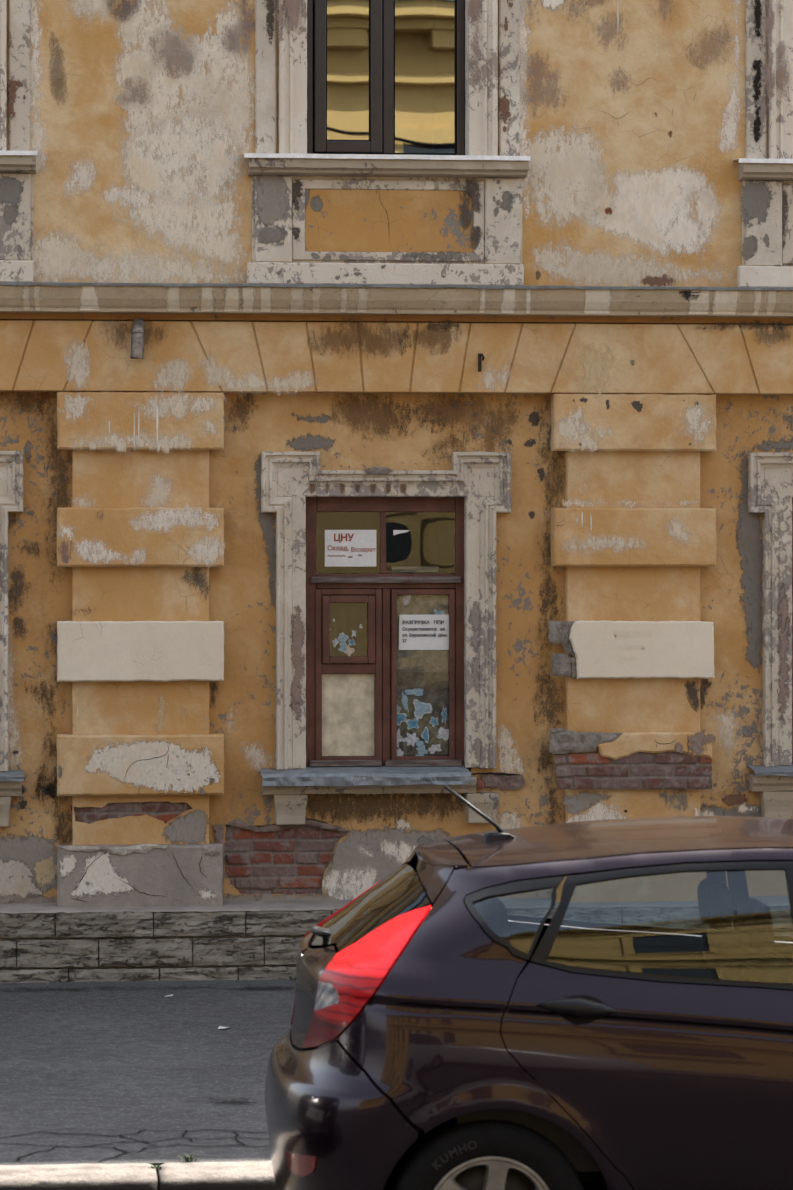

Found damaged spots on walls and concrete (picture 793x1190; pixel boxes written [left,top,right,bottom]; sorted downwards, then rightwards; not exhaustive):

peeling [7,0,48,173]
peeling [17,0,323,284]
peeling [493,0,723,287]
spalling [739,180,773,262]
peeling [74,367,314,453]
peeling [286,413,336,452]
peeling [58,525,146,567]
peeling [735,438,793,673]
spalling [548,621,577,678]
peeling [777,583,791,721]
flaking render [0,739,450,903]
spalling [549,711,762,823]